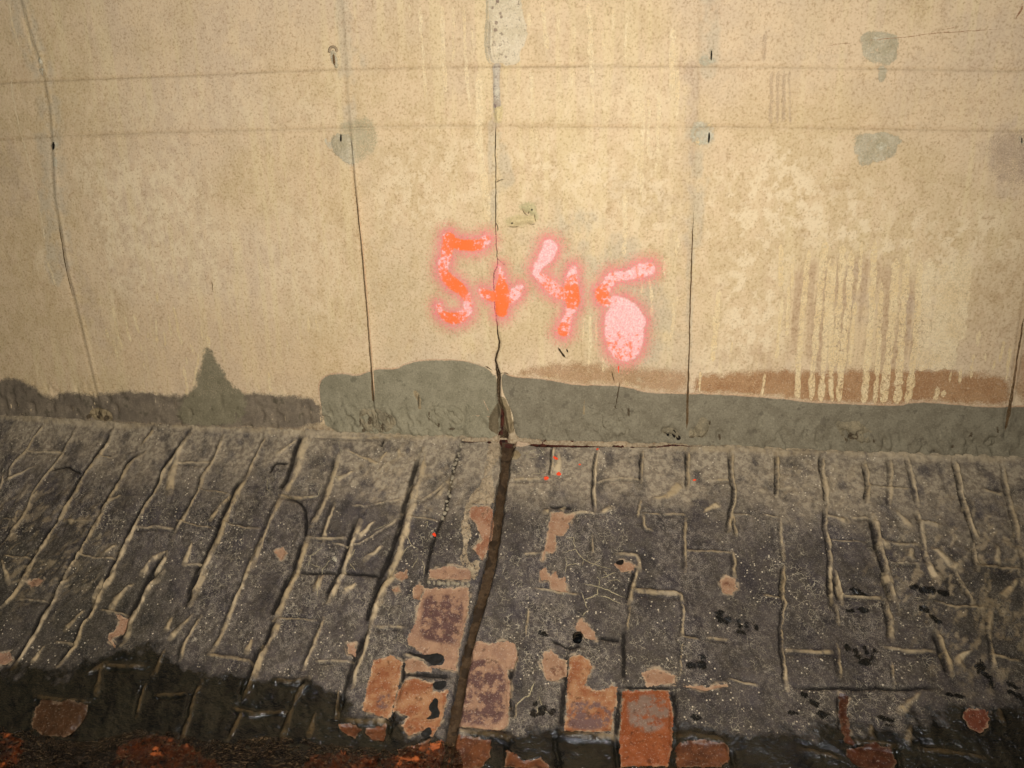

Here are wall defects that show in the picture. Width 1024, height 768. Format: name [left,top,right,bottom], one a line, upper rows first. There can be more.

peeling [31,699,88,737]
crack [353,171,375,402]
peeling [302,441,518,768]
leakage [0,238,1024,458]
peeling [539,511,575,592]
crack [440,129,702,768]
peeling [541,650,730,768]
peeling [963,708,990,733]